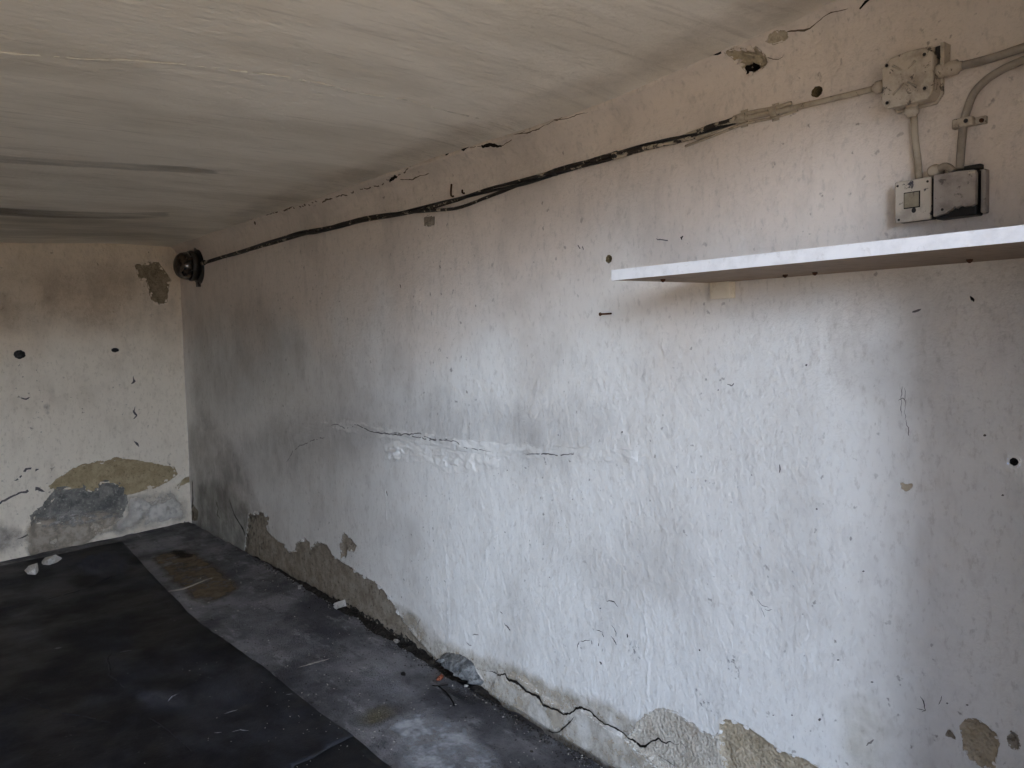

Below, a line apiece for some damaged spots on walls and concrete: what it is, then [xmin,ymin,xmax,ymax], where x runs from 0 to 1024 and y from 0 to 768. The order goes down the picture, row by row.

spalling [724,30,788,76]
crack [0,52,588,225]
spalling [135,262,171,304]
spalling [28,457,190,556]
spalling [245,511,483,685]
crack [479,669,687,768]
flaking render [626,708,819,768]
spalling [945,704,1020,768]